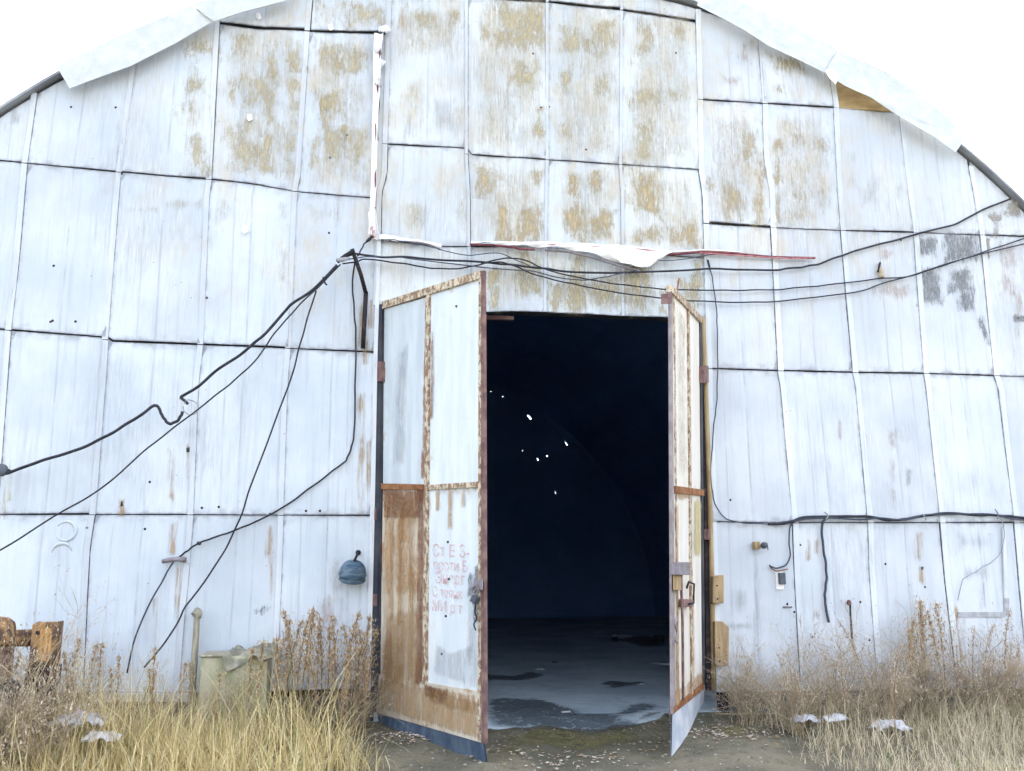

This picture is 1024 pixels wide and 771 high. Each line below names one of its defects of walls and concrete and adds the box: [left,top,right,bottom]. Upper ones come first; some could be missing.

peeling [320,47,363,72]
peeling [484,6,545,48]
peeling [777,58,804,73]
peeling [228,50,300,172]
peeling [311,89,363,168]
peeling [564,175,612,242]
peeling [634,174,660,213]
peeling [671,225,699,249]
peeling [743,134,781,225]
rust [423,303,433,429]
rust [676,493,701,561]
rust [379,446,477,737]